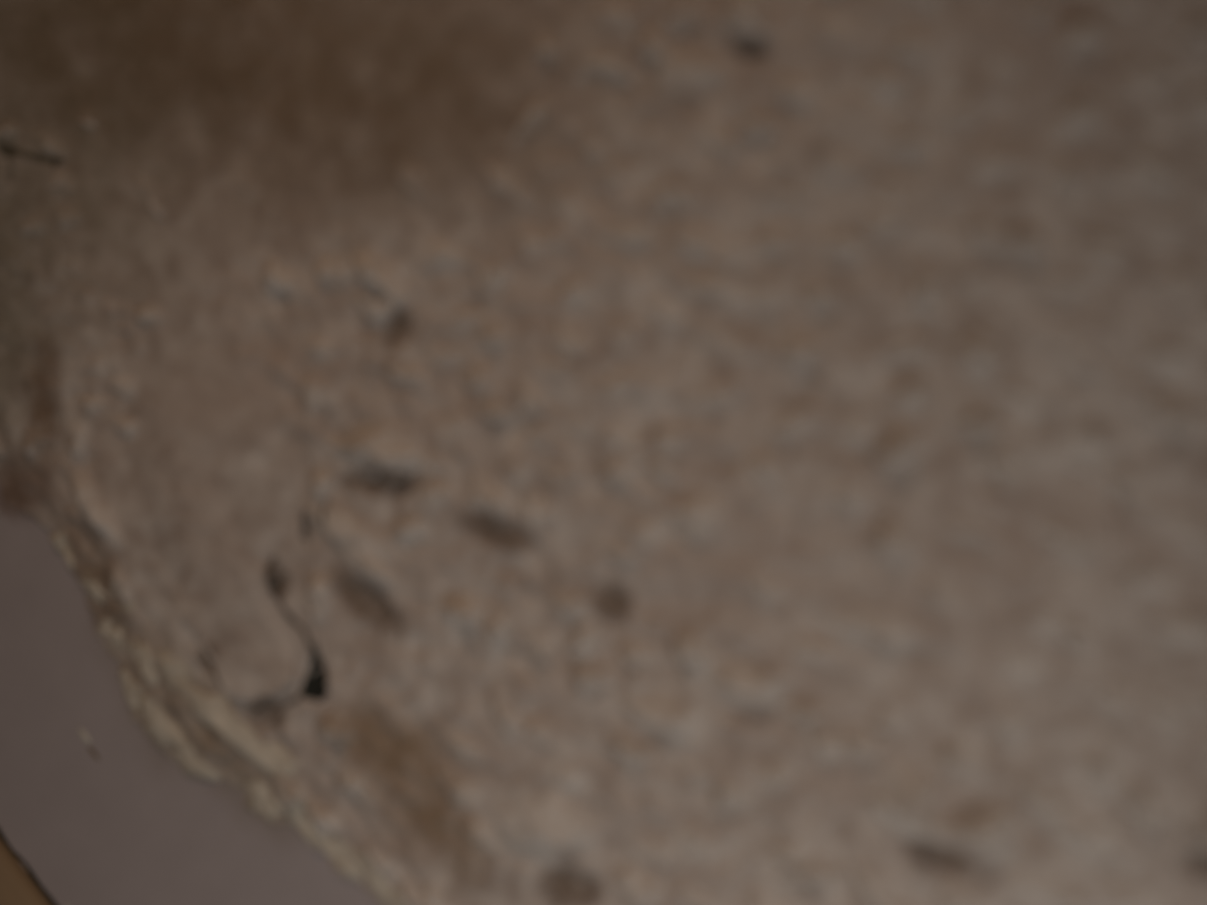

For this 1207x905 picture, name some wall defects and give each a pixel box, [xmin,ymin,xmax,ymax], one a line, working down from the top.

spalling [300,639,329,702]